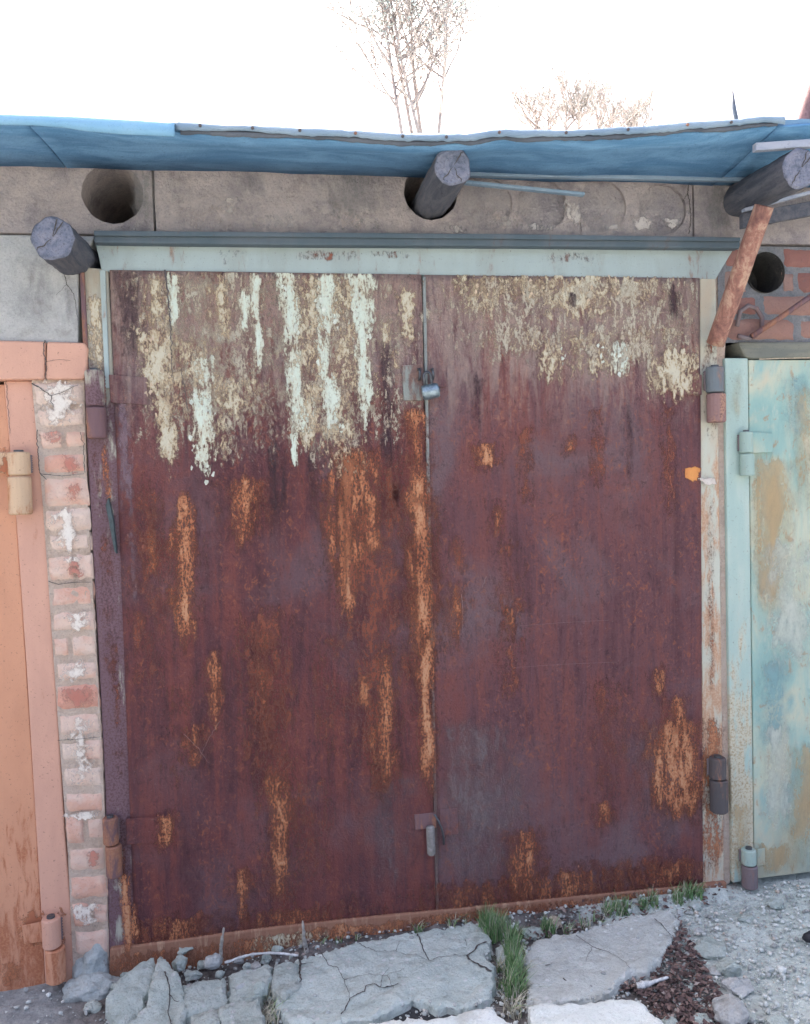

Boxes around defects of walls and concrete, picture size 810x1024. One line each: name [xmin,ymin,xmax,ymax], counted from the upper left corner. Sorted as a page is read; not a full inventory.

rust [140,491,206,652]
rust [211,473,271,551]
rust [301,406,471,800]
peeling [117,272,699,485]
rust [469,440,504,473]
peeling [770,540,806,656]
rust [109,629,723,972]
crack [298,933,492,1014]